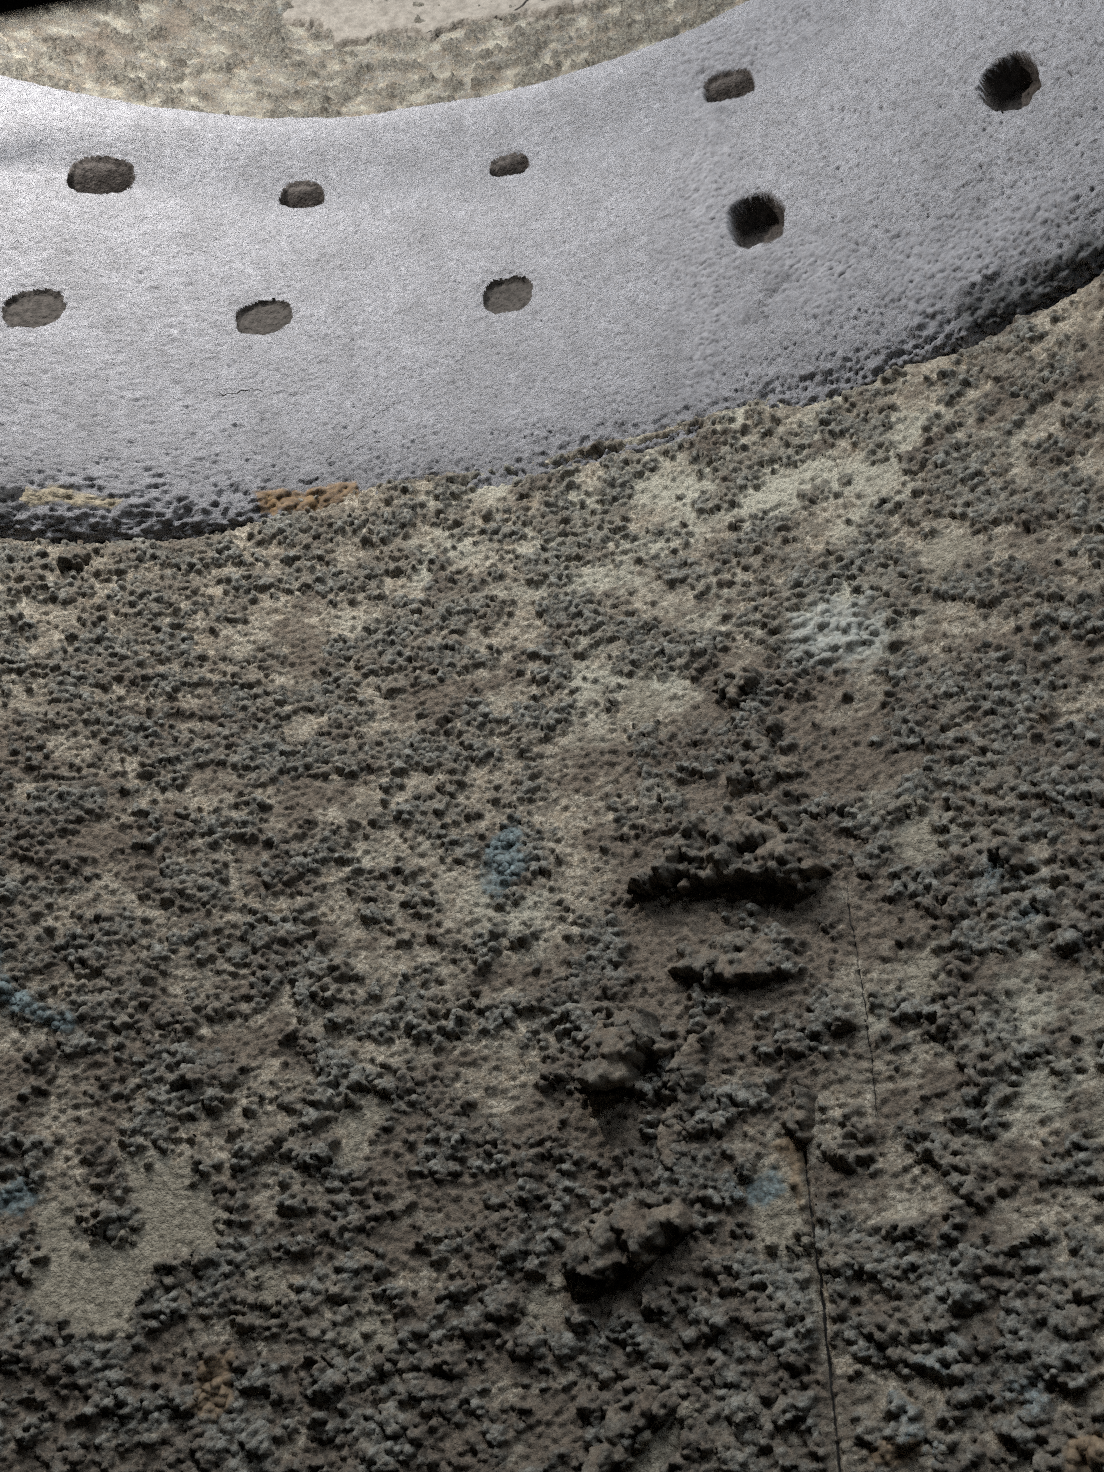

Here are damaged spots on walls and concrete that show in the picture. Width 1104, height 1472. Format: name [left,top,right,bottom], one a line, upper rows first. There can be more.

crack [785,1147,842,1472]